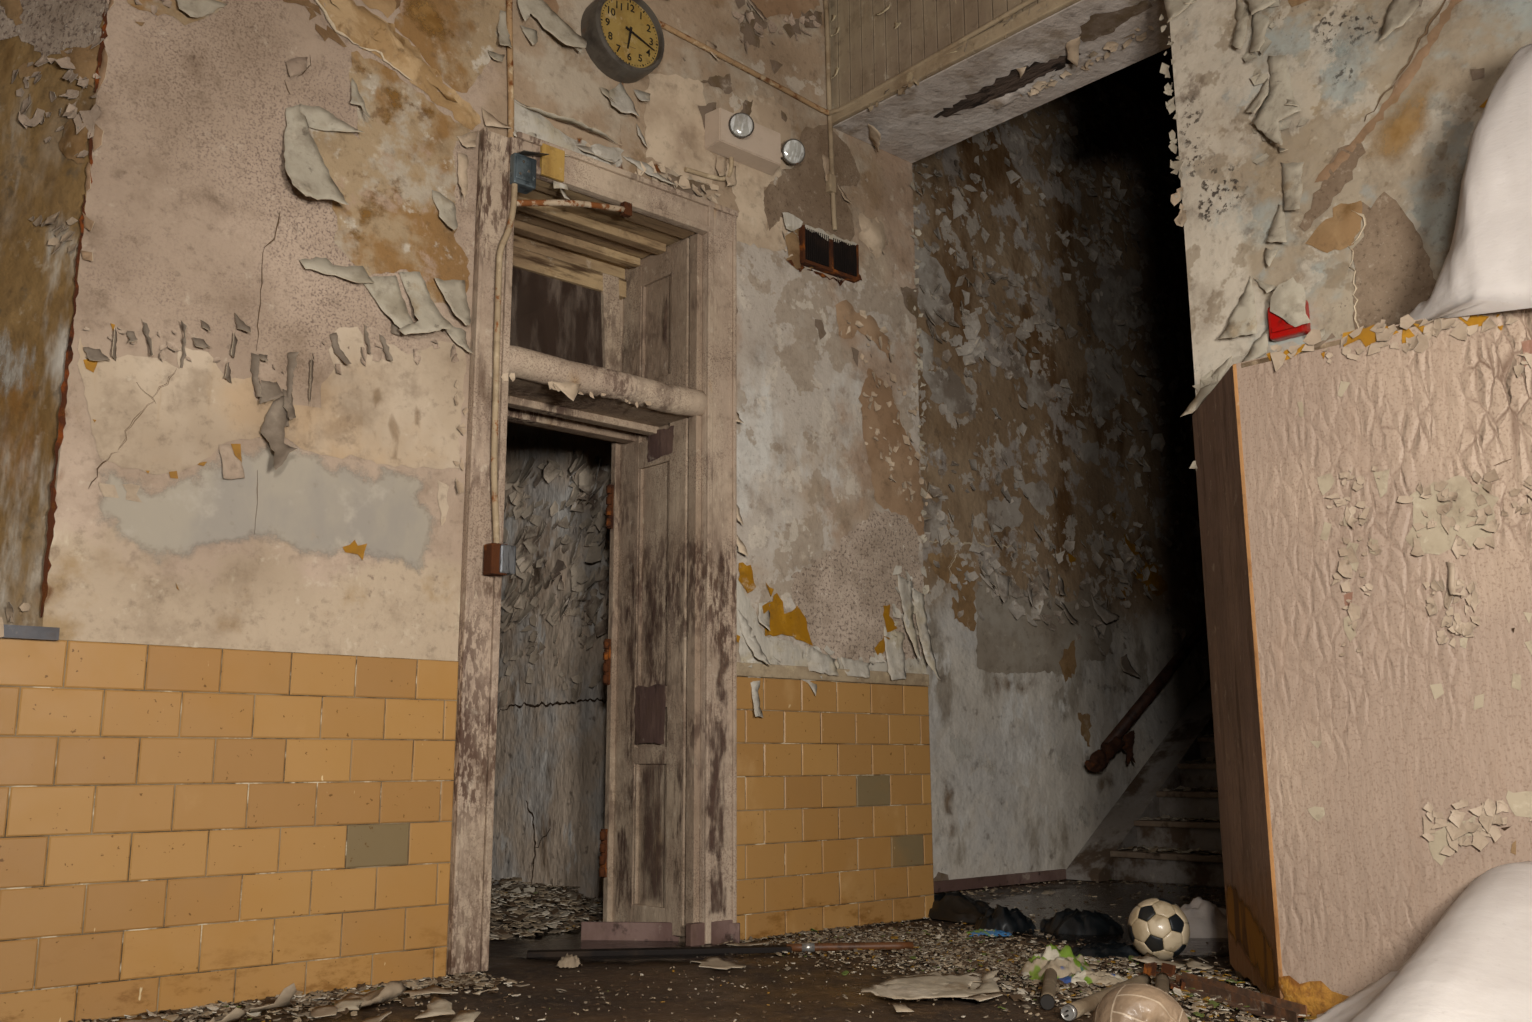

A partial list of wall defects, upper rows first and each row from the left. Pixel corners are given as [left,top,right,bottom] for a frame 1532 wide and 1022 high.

peeling [0,0,108,164]
crack [88,373,174,489]
peeling [78,0,1532,717]
peeling [616,564,682,905]
peeling [706,719,726,913]
peeling [1078,713,1092,747]
peeling [1422,791,1532,866]